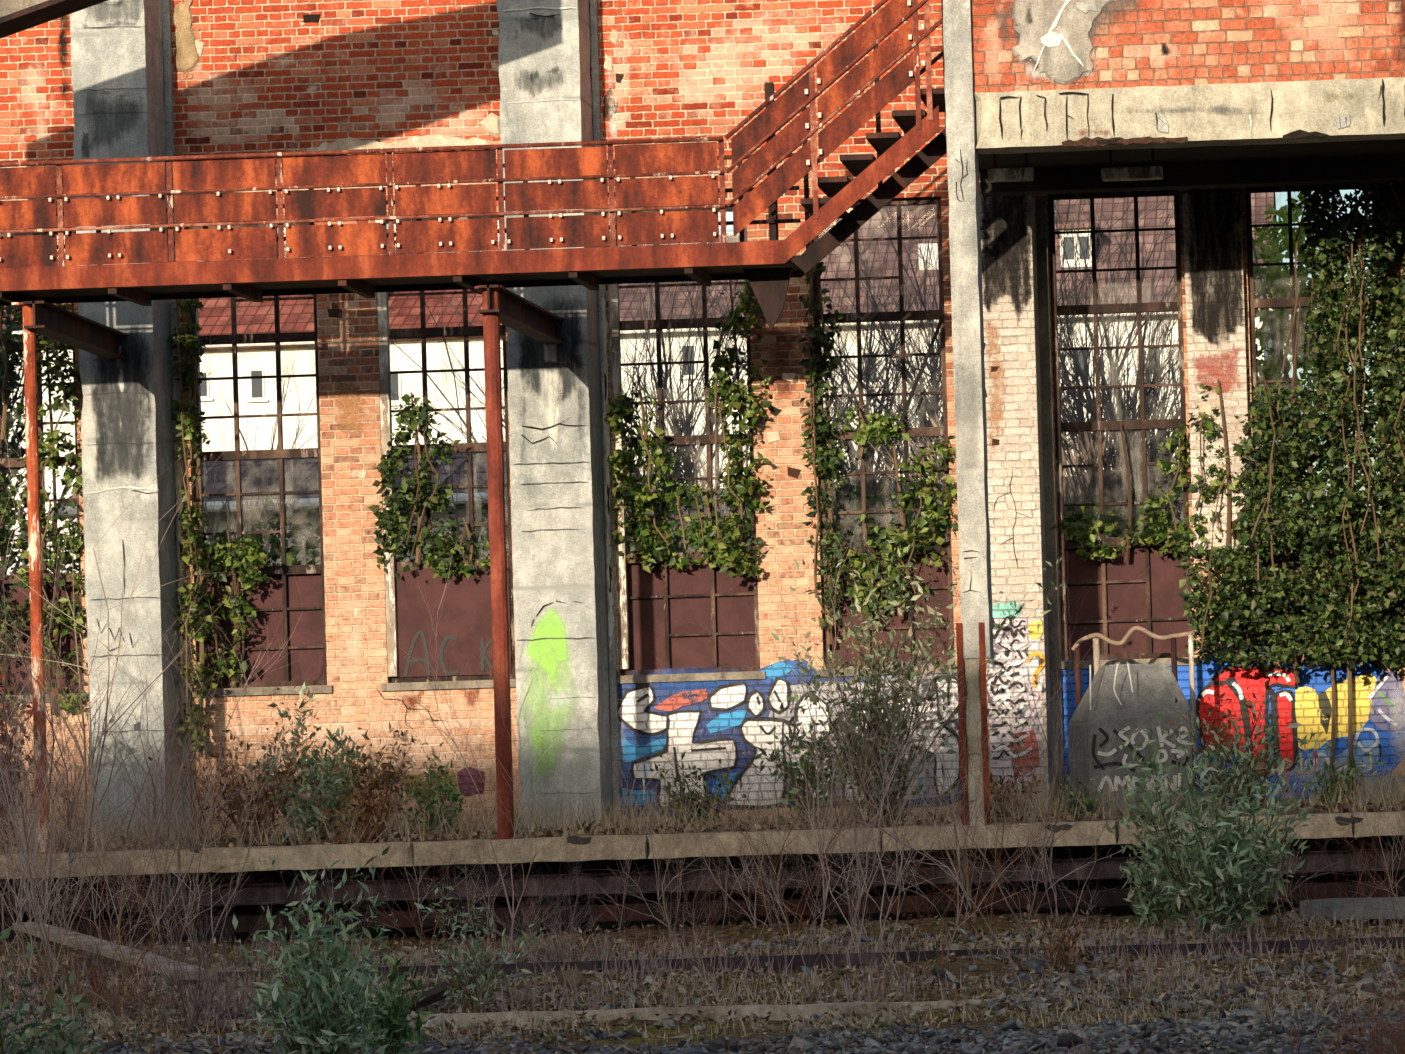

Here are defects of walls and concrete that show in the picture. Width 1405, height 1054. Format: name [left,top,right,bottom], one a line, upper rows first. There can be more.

damp [59,16,68,65]
damp [520,16,562,38]
flaking render [1011,0,1134,86]
damp [519,68,563,92]
damp [19,69,68,142]
damp [82,96,137,157]
spalling [1062,113,1188,147]
spalling [1282,114,1351,140]
damp [93,327,150,479]